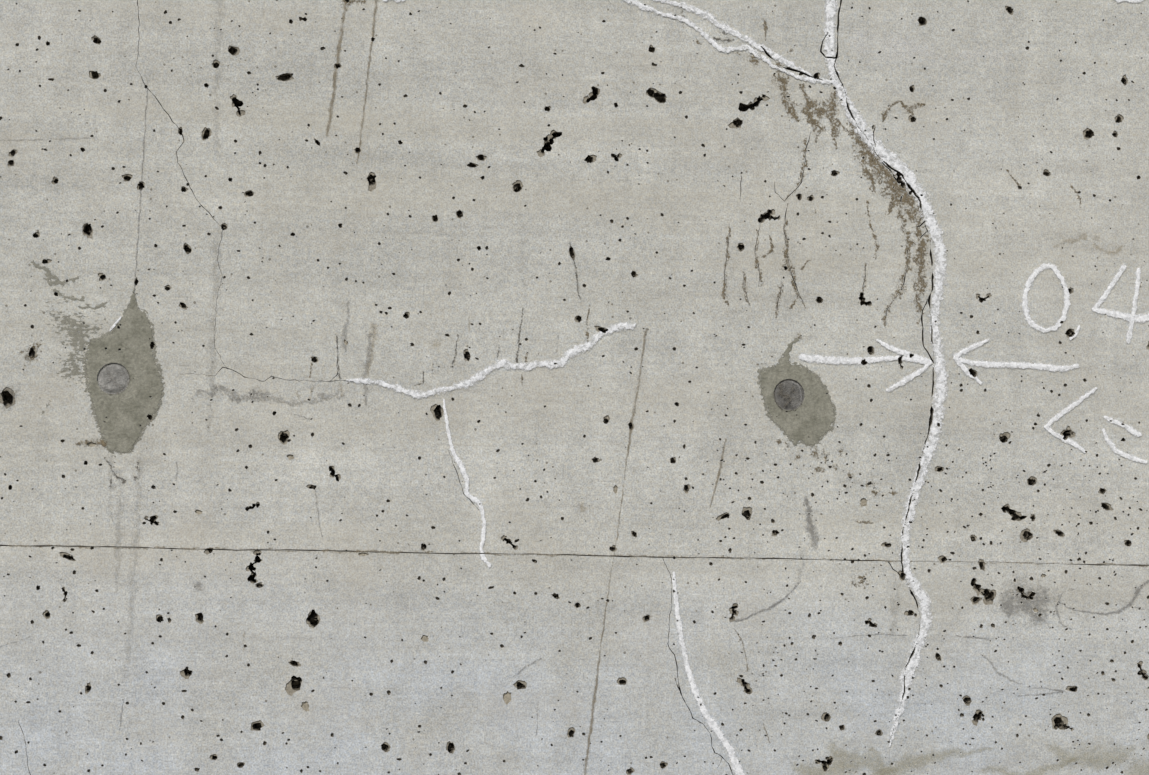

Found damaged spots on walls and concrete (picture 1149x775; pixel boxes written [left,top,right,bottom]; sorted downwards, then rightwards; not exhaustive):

crack [724,132,811,314]
crack [761,0,934,742]
crack [663,559,733,774]